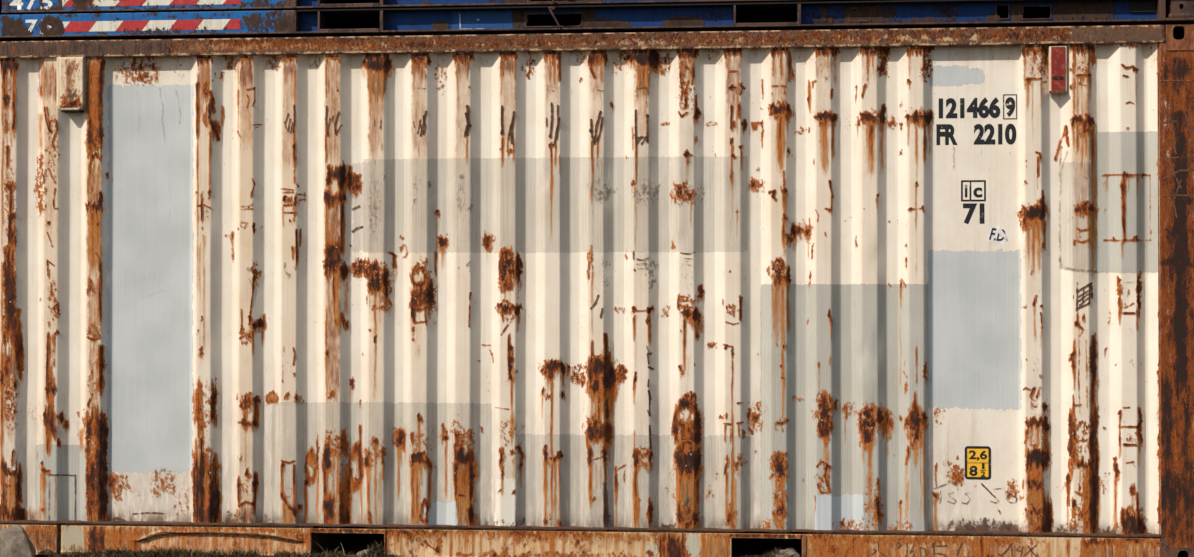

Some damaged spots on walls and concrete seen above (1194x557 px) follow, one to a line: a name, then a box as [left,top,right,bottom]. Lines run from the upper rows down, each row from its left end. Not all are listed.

rust [662,15,704,26]
rust [1064,51,1194,557]